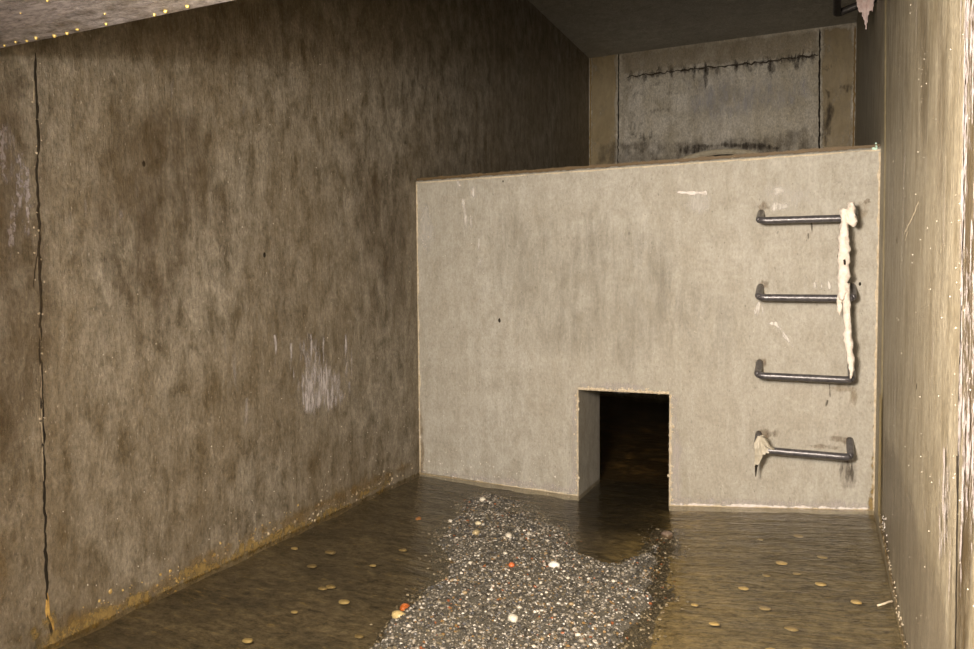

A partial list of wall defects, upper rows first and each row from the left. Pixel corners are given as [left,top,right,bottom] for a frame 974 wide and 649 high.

crack [32,52,53,635]
leakage [31,466,406,649]
leakage [293,336,340,412]
leakage [411,26,881,511]
leakage [939,0,974,649]